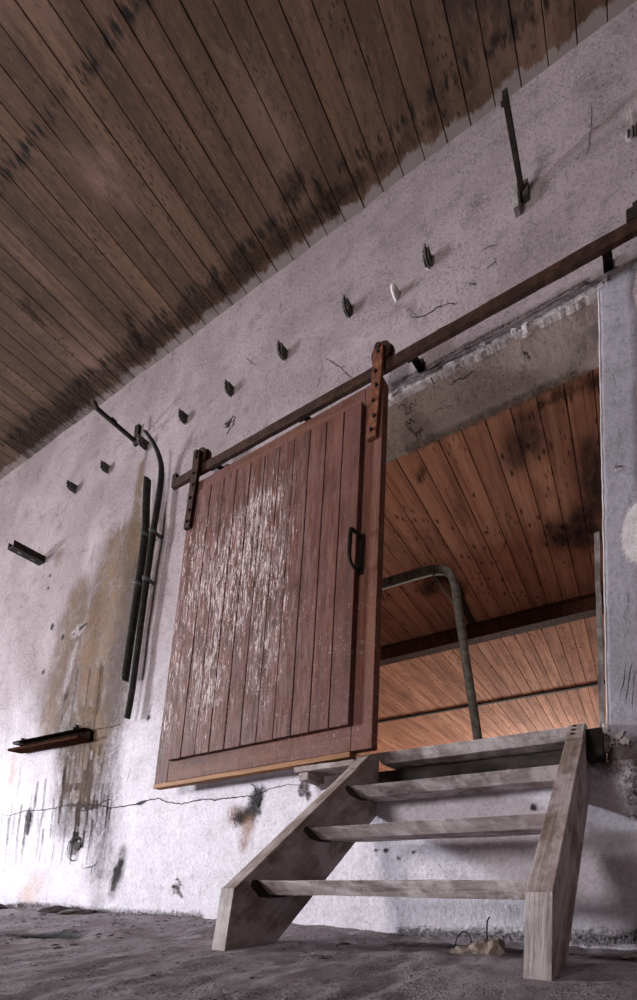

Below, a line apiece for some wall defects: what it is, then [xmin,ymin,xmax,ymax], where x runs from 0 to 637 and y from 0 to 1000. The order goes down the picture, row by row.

water stain [0,458,146,877]
crack [1,783,296,830]
water stain [3,167,367,458]
flaking render [388,275,630,754]